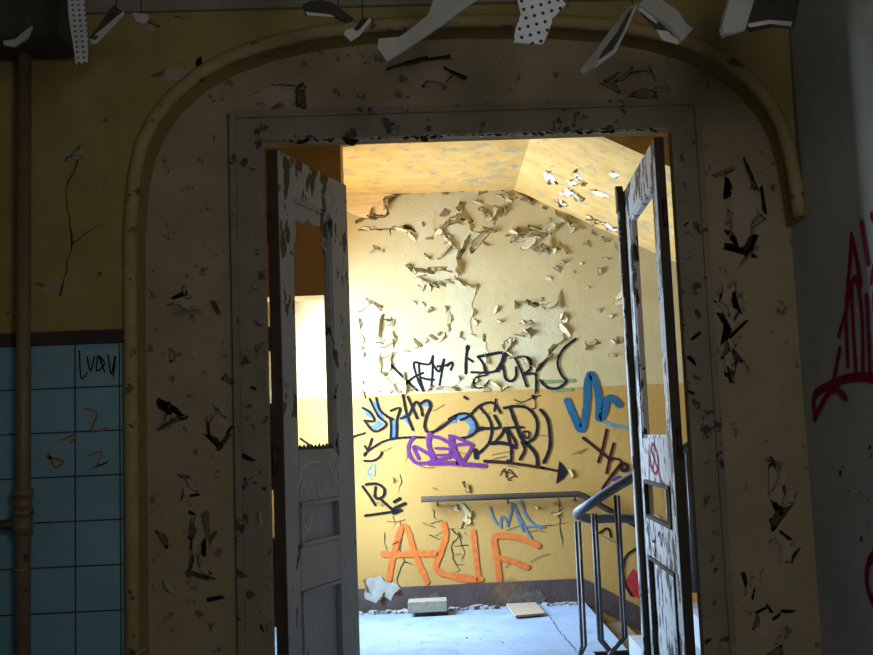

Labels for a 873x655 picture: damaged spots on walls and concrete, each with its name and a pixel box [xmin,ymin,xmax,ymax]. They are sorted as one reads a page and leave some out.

peeling [461,127,658,136]
peeling [283,134,450,146]
peeling [346,169,622,399]